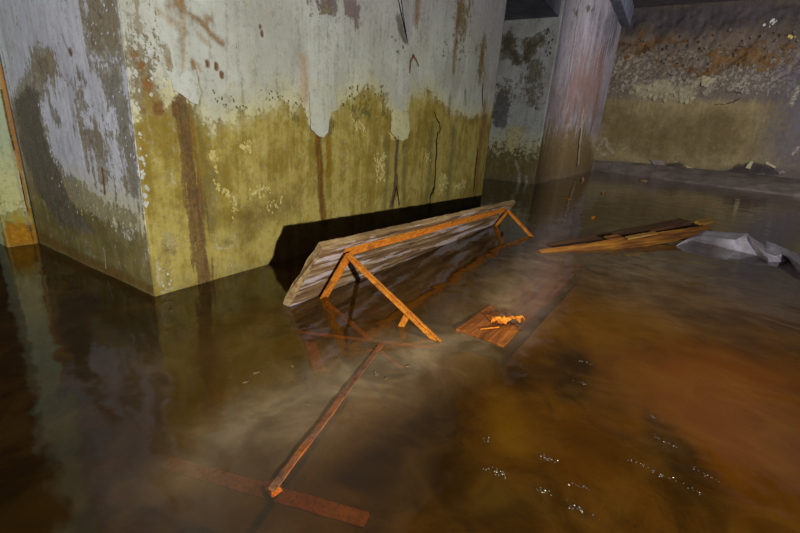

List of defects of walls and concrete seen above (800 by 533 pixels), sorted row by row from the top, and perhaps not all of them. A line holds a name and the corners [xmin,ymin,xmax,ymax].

corrosion [0,65,30,215]
corrosion [154,91,214,295]
corrosion [315,135,331,220]
crack [428,112,441,214]
damp [492,91,526,152]
damp [537,116,739,180]